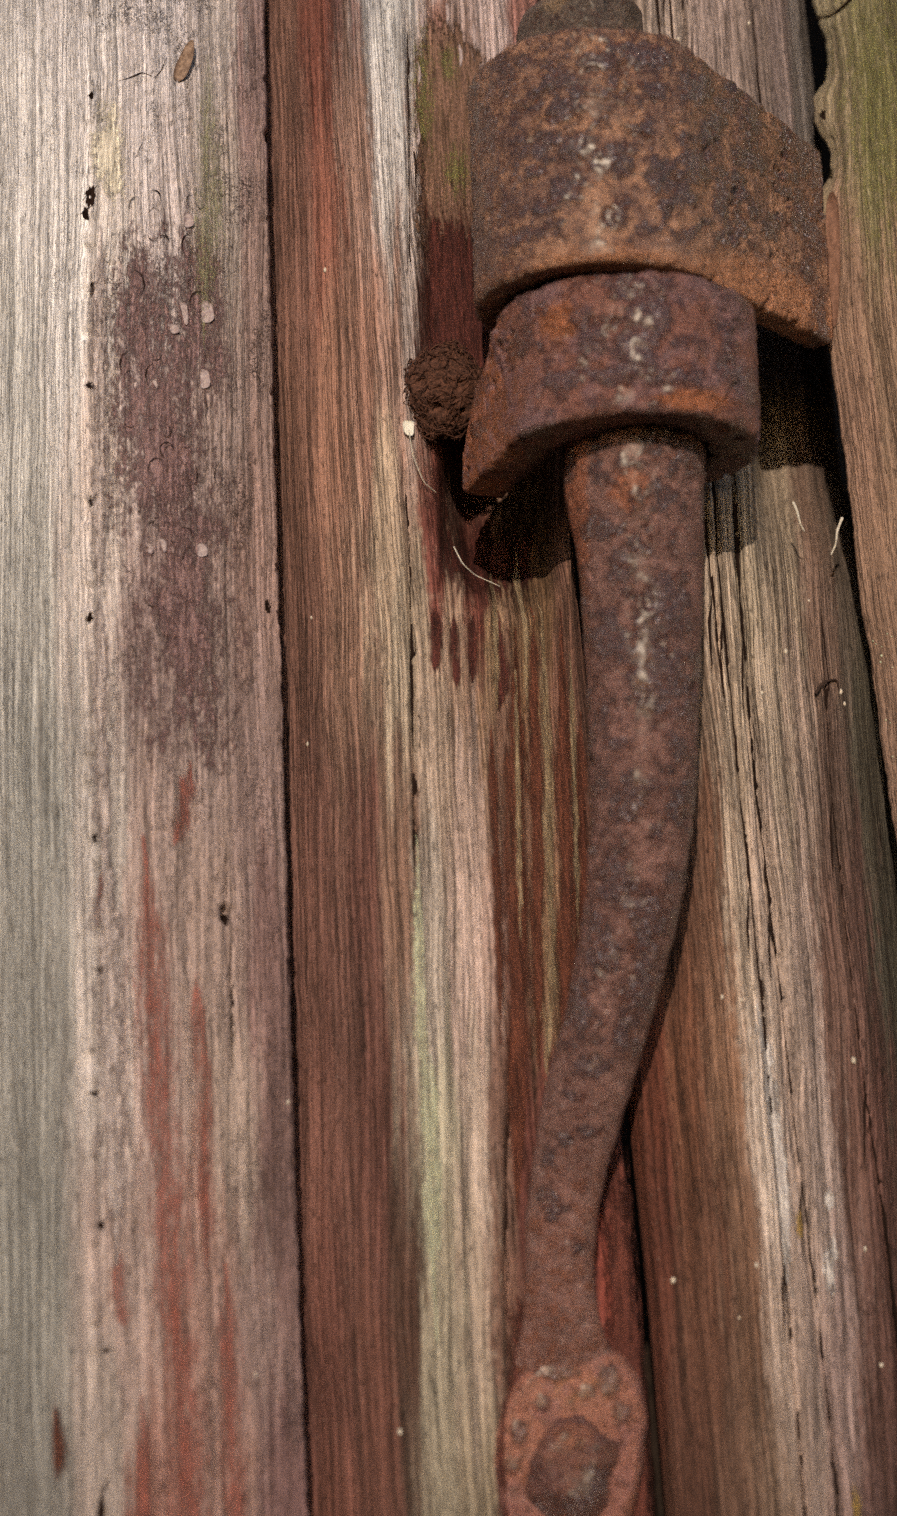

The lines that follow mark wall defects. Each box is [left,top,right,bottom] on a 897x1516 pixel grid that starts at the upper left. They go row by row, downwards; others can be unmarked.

crack [813,0,850,41]
rust [415,206,491,369]
rust [427,502,589,1217]